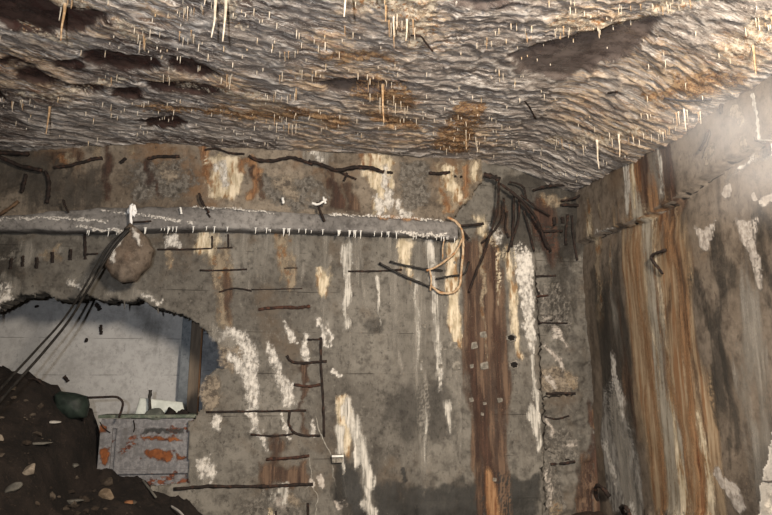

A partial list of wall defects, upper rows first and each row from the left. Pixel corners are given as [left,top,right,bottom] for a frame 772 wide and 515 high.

damp [20,21,88,48]
damp [49,0,95,9]
damp [18,77,127,105]
corrosion [244,155,265,200]
corrosion [462,231,512,515]
spalling [535,274,572,347]
damp [473,174,643,515]
spalling [541,344,578,395]
corrosion [613,143,726,515]
damp [708,228,771,483]
damp [268,482,288,515]
spalling [541,415,579,515]